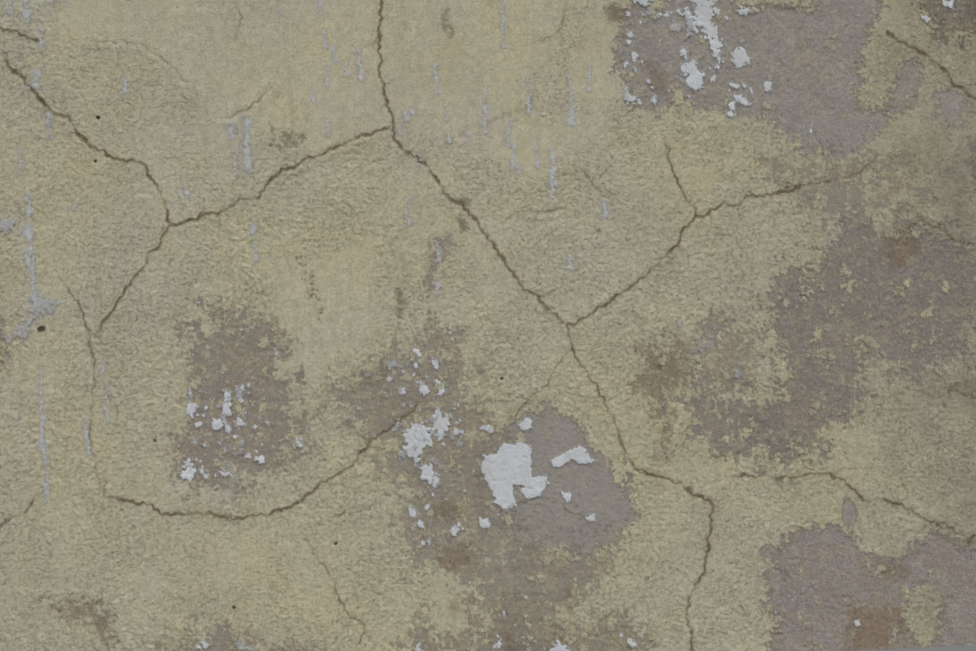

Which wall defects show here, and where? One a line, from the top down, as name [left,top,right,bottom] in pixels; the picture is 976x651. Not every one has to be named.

crack [6,59,157,185]
crack [887,31,976,99]
crack [69,0,651,385]
crack [667,150,830,252]
spalling [604,0,976,475]
peeling [0,291,61,391]
spalling [154,297,326,502]
crack [115,409,415,520]
spalling [330,309,661,651]
crack [618,430,714,651]
crack [740,473,976,543]
spalling [155,614,326,651]